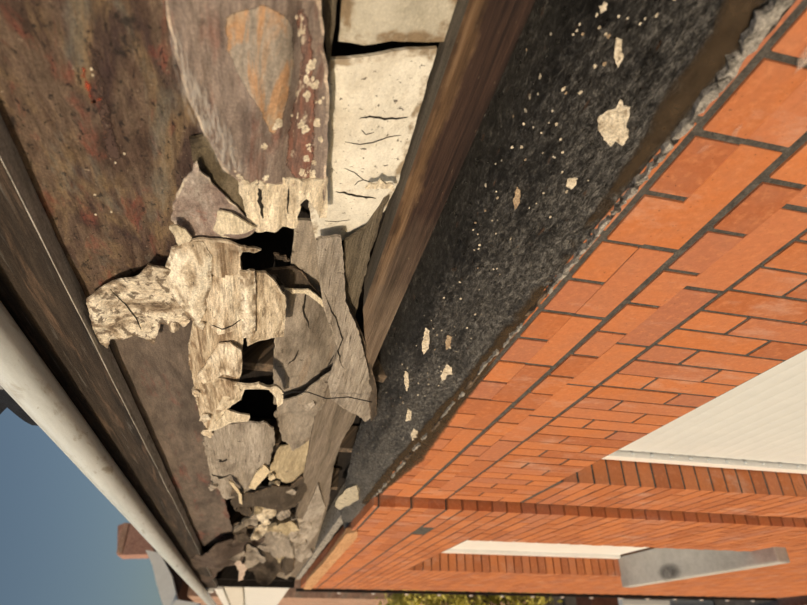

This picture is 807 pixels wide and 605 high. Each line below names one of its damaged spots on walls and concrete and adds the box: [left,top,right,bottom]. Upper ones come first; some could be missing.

crack [347,115,408,145]
peeling [171,161,257,240]
crack [336,168,376,199]
spalling [372,0,795,498]
peeling [86,263,190,348]